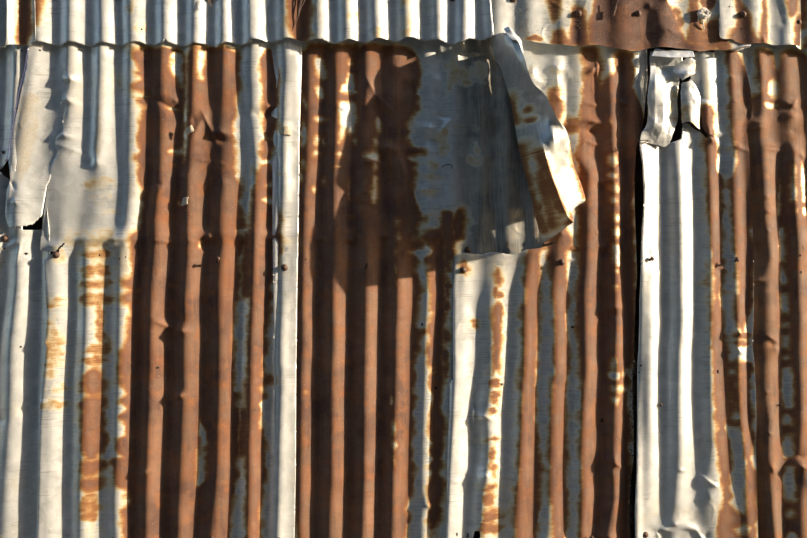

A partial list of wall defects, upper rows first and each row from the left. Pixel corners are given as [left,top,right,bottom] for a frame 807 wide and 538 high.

corrosion [40,0,646,538]
peeling [491,27,585,243]
corrosion [656,0,807,538]